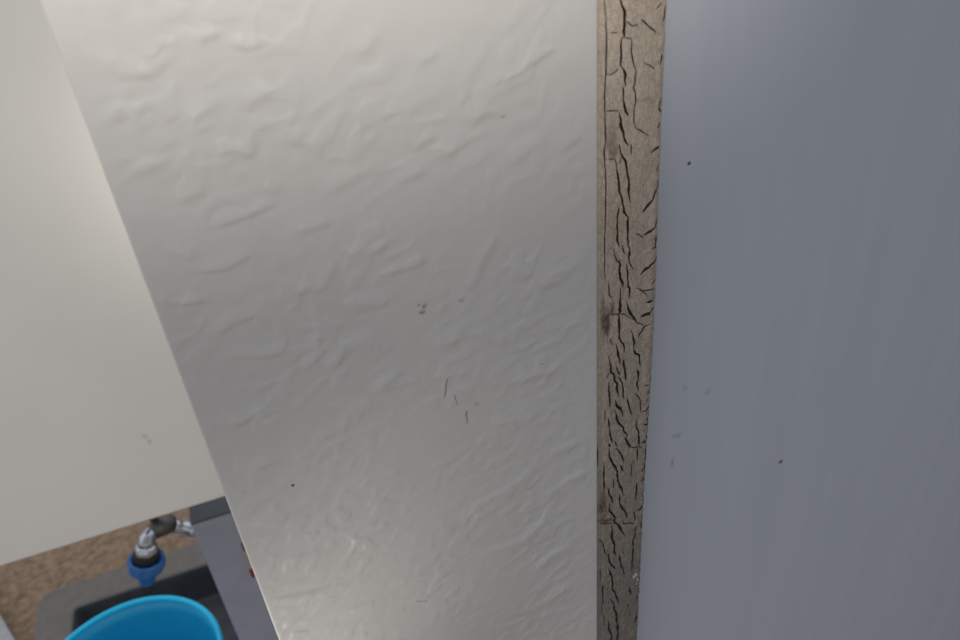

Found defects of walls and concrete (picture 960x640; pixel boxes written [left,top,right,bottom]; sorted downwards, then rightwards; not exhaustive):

crack [597,0,666,640]